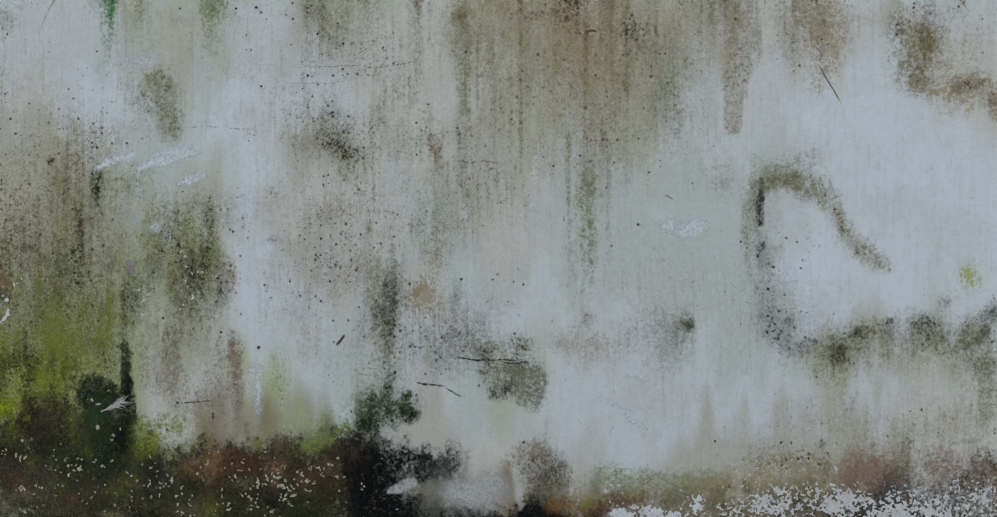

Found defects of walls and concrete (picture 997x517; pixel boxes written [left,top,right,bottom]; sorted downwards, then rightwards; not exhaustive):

leakage [291,74,375,171]
leakage [453,0,678,246]
leakage [678,0,755,133]
leakage [888,2,942,96]
leakage [747,155,882,269]
leakage [0,108,143,466]
leakage [294,193,546,415]
leakage [740,232,943,379]
leakage [298,423,601,517]
leakage [778,447,997,517]